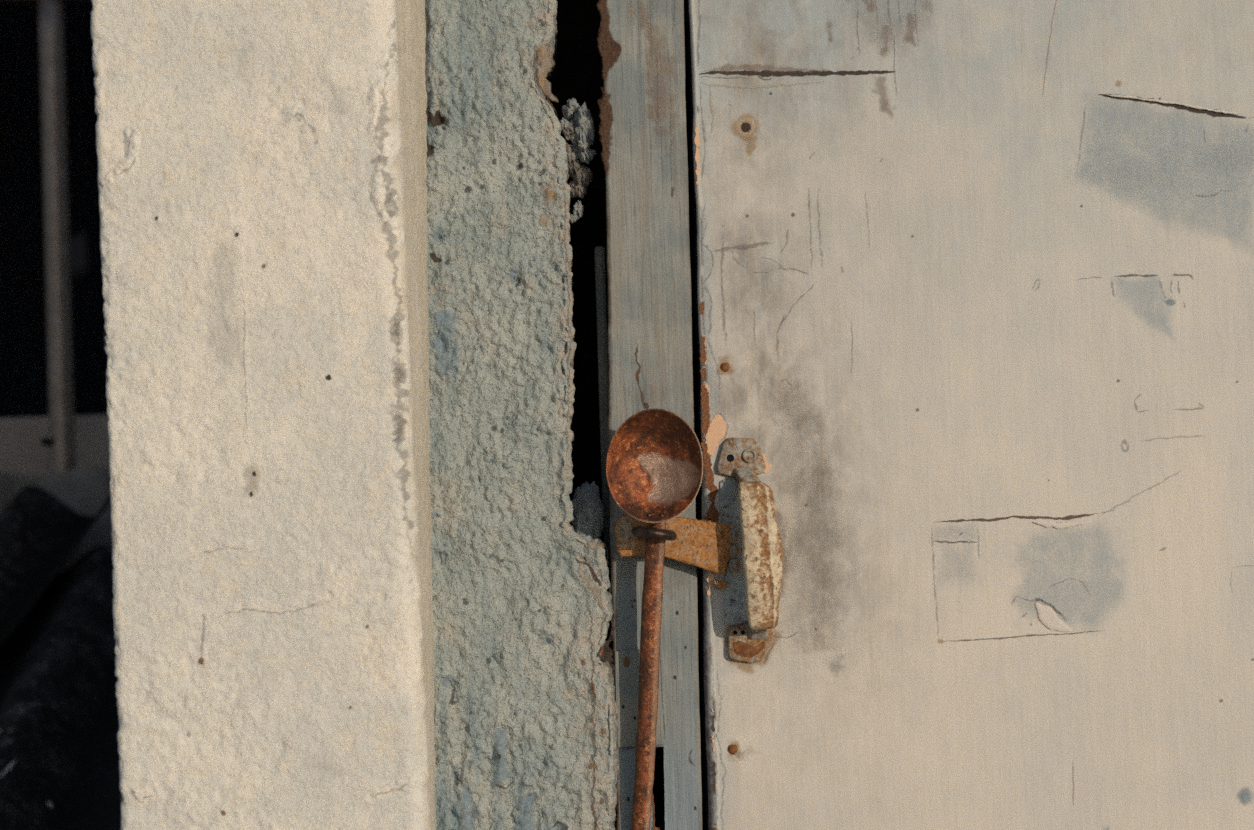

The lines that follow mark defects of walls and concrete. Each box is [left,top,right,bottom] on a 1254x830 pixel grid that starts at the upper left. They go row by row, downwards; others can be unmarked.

peeling [597,0,621,79]
crack [699,70,895,95]
peeling [1099,94,1246,118]
spalling [535,44,613,465]
peeling [938,513,1096,543]
peeling [960,598,1095,641]
rust [733,641,766,657]